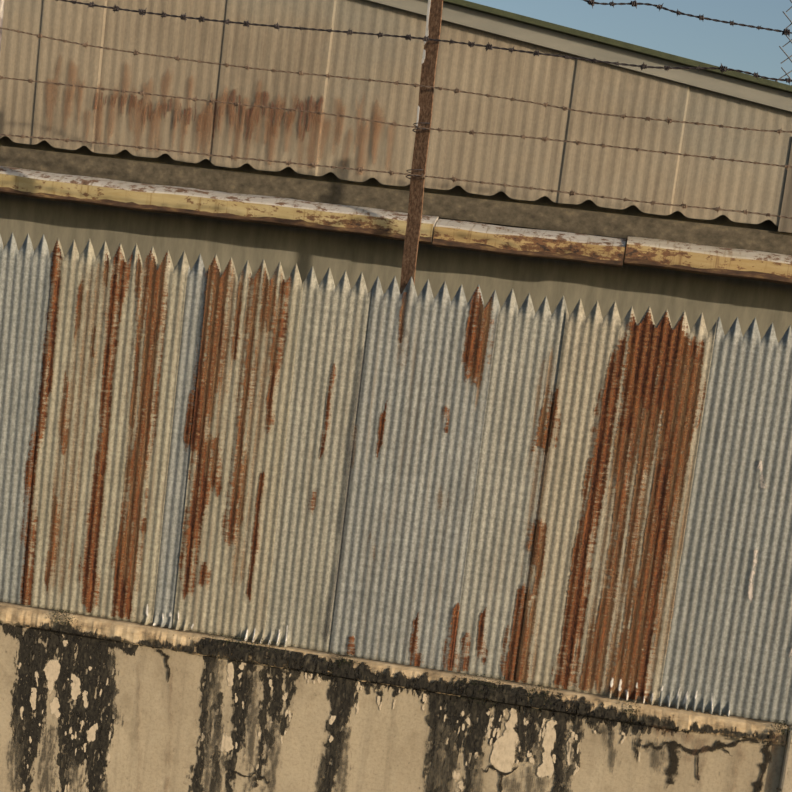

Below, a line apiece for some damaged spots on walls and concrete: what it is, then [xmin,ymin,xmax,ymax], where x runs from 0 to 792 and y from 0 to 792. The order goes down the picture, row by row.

rust [20,241,63,605]
rust [45,247,170,619]
rust [179,258,291,603]
water stain [0,621,786,792]
rust [410,613,421,667]
rust [443,603,488,672]
rust [461,287,494,407]
rust [500,349,561,683]
rust [551,310,706,702]
crack [644,729,782,792]